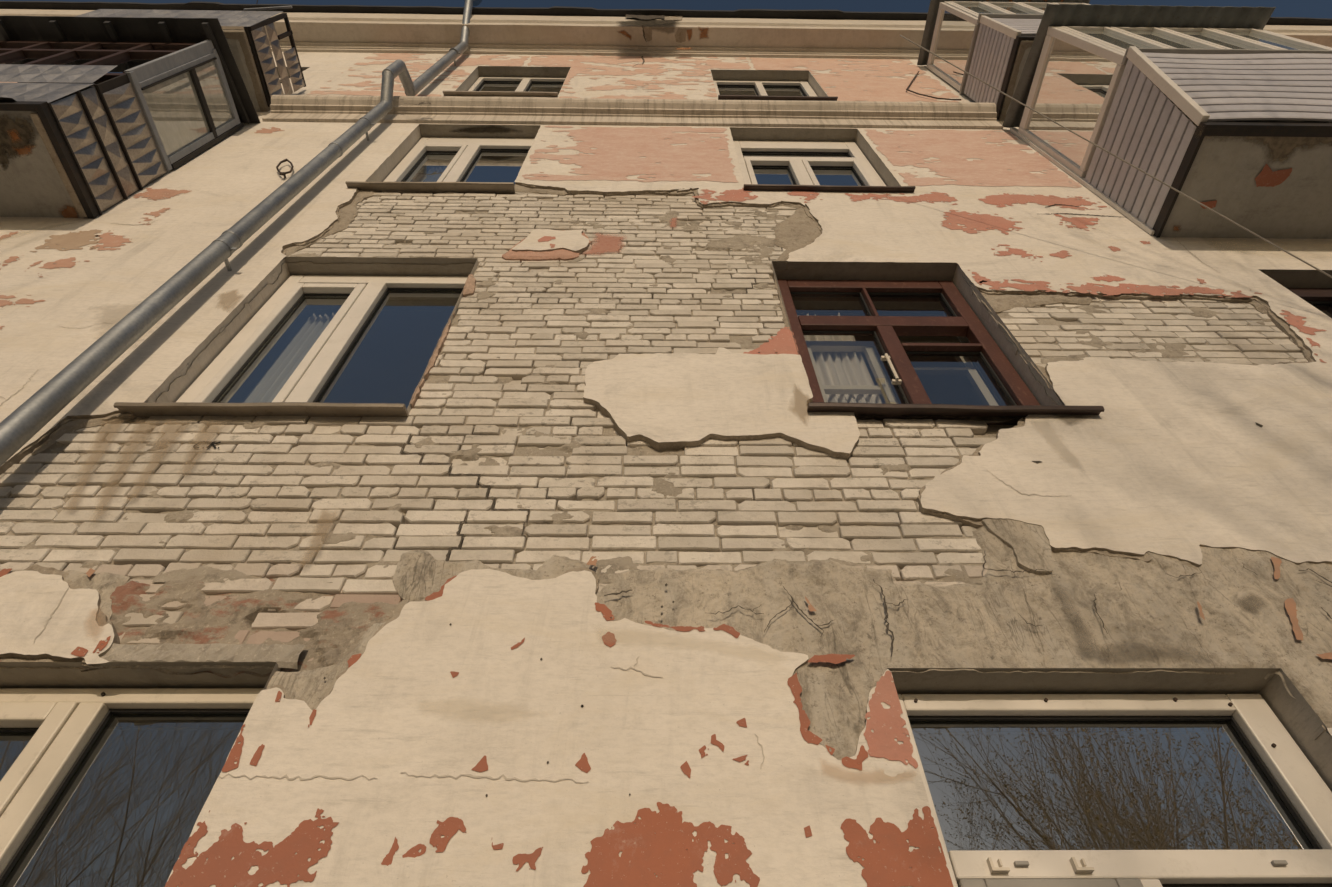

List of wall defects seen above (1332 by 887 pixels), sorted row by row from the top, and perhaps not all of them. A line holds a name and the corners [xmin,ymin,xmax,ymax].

peeling [310,14,964,102]
flaking render [969,272,1327,405]
flaking render [0,126,1152,673]
crack [711,586,833,637]
crack [873,579,906,657]
peeling [222,724,265,772]
peeling [787,654,918,770]
peeling [164,808,340,887]
peeling [381,817,466,866]
peeling [492,842,543,871]
peeling [581,802,760,887]
peeling [841,806,953,887]